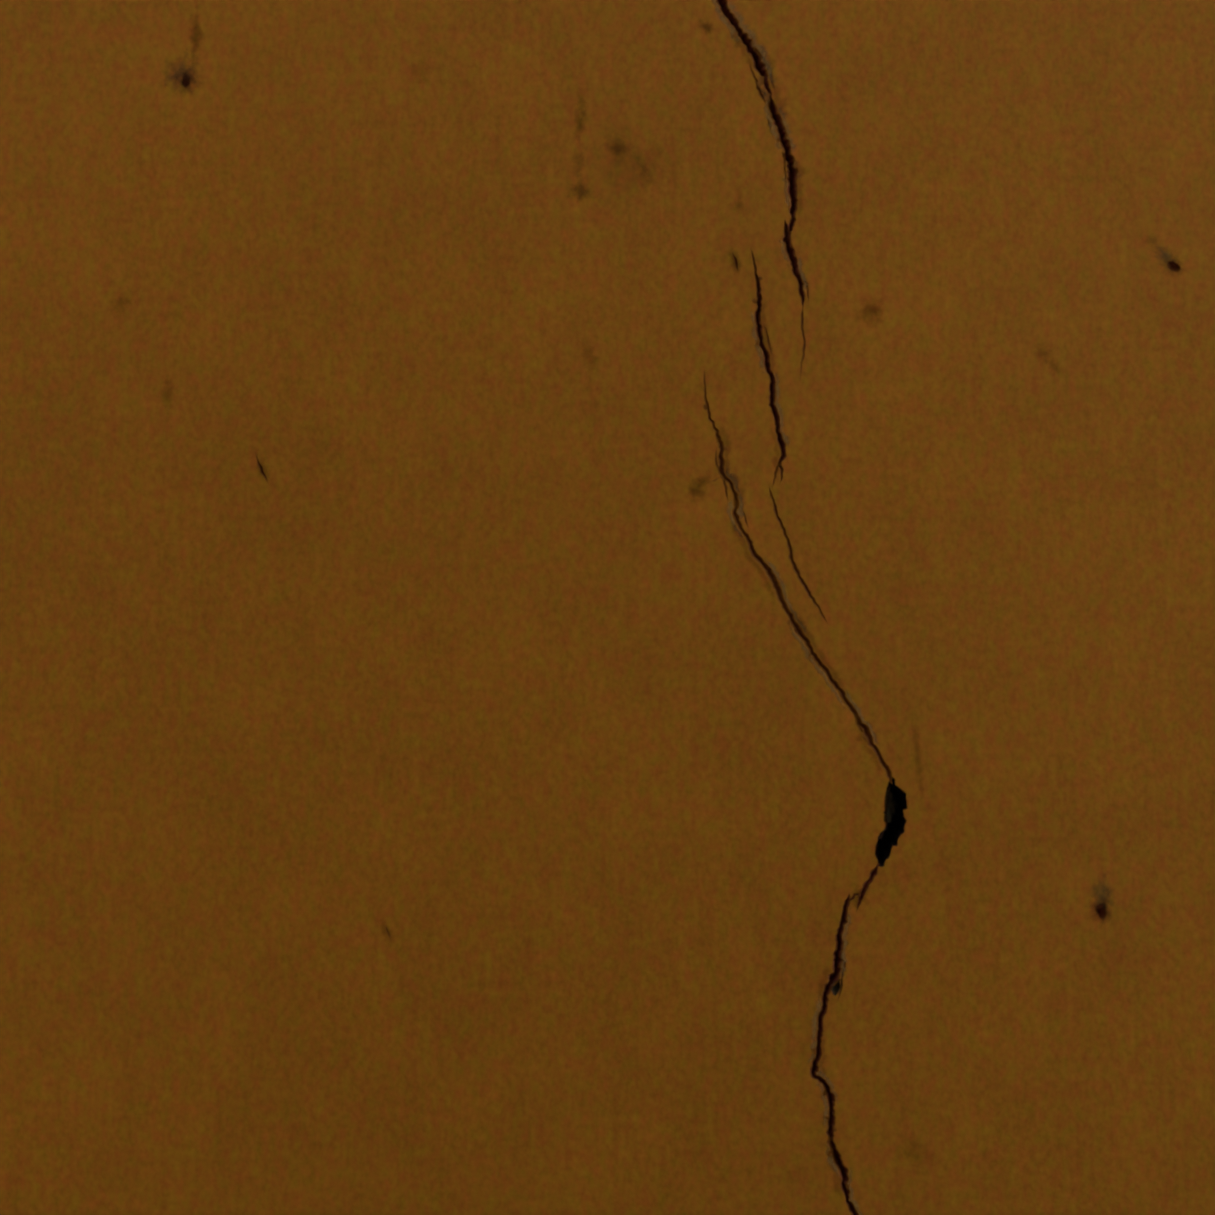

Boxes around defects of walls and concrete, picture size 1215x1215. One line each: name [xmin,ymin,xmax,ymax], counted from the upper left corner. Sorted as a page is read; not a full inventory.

crack [703,0,892,783]
crack [809,863,879,1215]